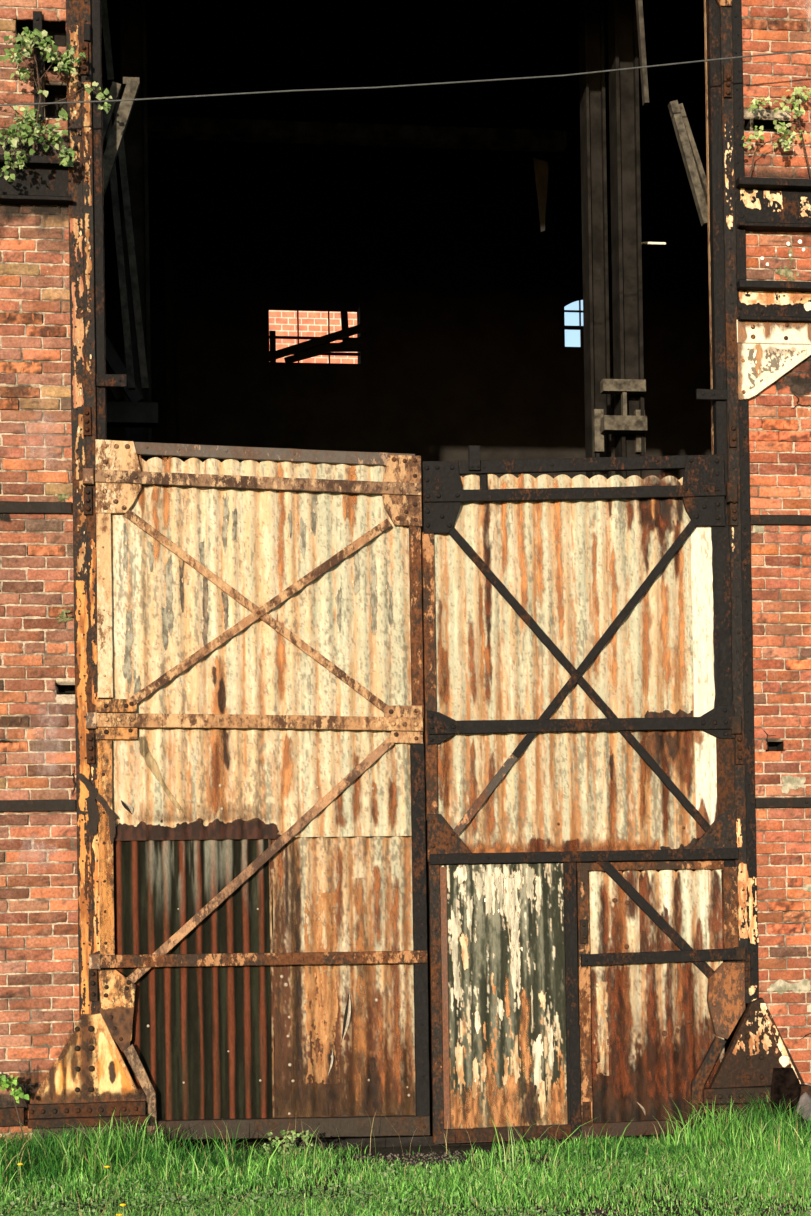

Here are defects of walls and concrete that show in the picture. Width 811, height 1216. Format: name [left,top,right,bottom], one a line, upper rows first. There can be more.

peeling [799,196,811,218]
peeling [739,290,811,311]
peeling [0,20,100,1015]
corrosion [138,455,171,559]
corrosion [278,465,286,592]
corrosion [276,614,286,698]
corrosion [468,473,719,853]
corrosion [76,656,416,1118]
peeling [736,818,811,944]
peeling [449,863,555,1119]
corrosion [590,870,724,1123]
peeling [732,985,801,1084]